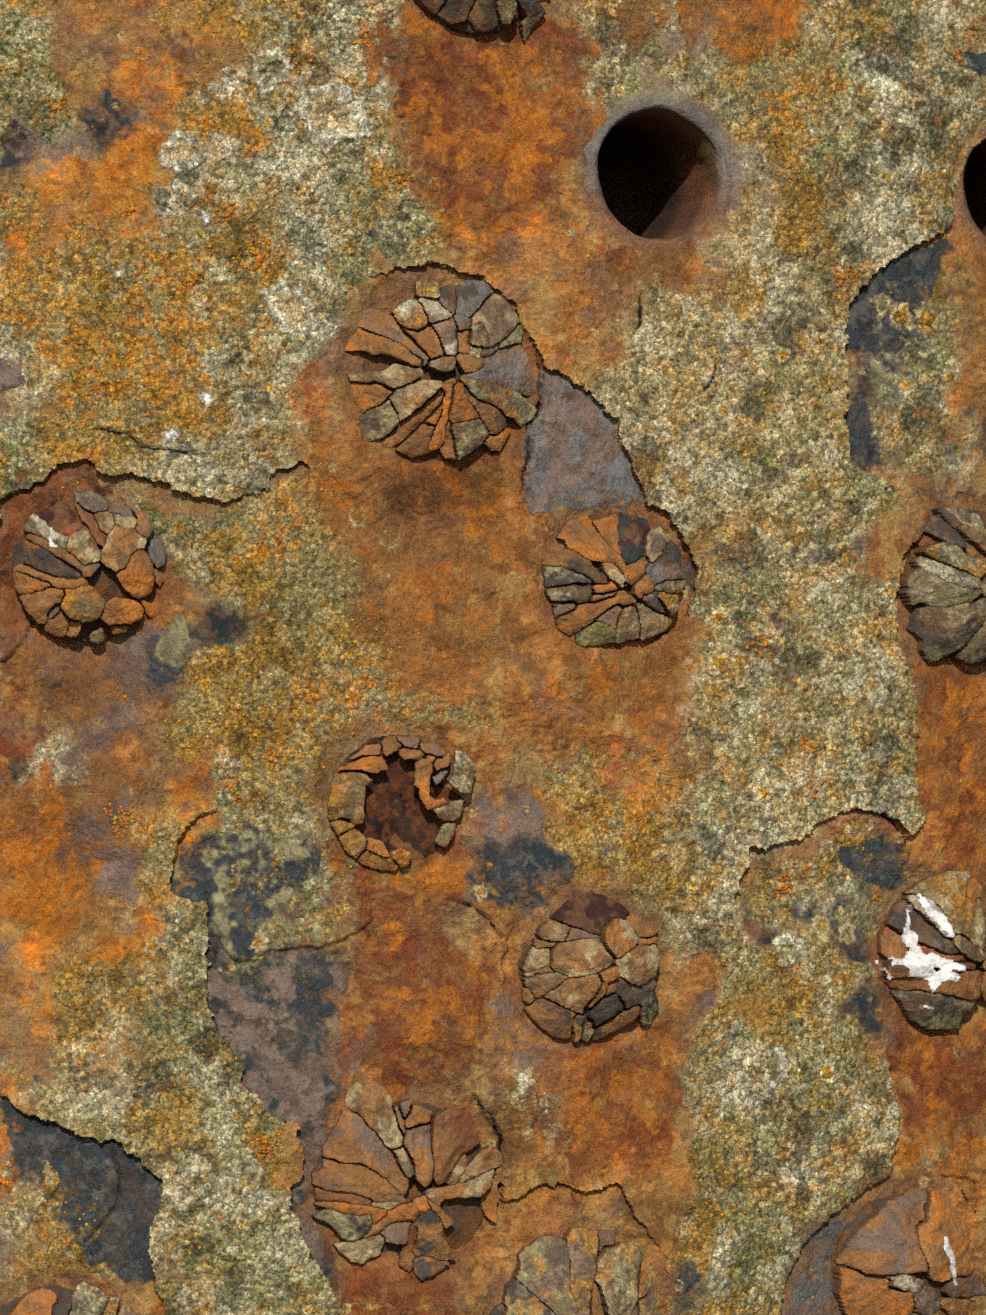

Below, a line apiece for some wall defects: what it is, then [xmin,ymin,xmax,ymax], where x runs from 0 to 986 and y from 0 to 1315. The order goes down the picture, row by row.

spalling [845,233,948,354]
spalling [522,367,644,515]
spalling [844,401,876,471]
corrosion [541,514,686,647]
spalling [146,614,192,691]
spalling [839,834,907,889]
corrosion [876,507,986,1180]
corrosion [310,735,502,1315]
corrosion [518,891,680,1204]
spalling [0,1096,163,1281]
corrosion [489,1227,669,1315]
corrosion [832,1188,986,1315]